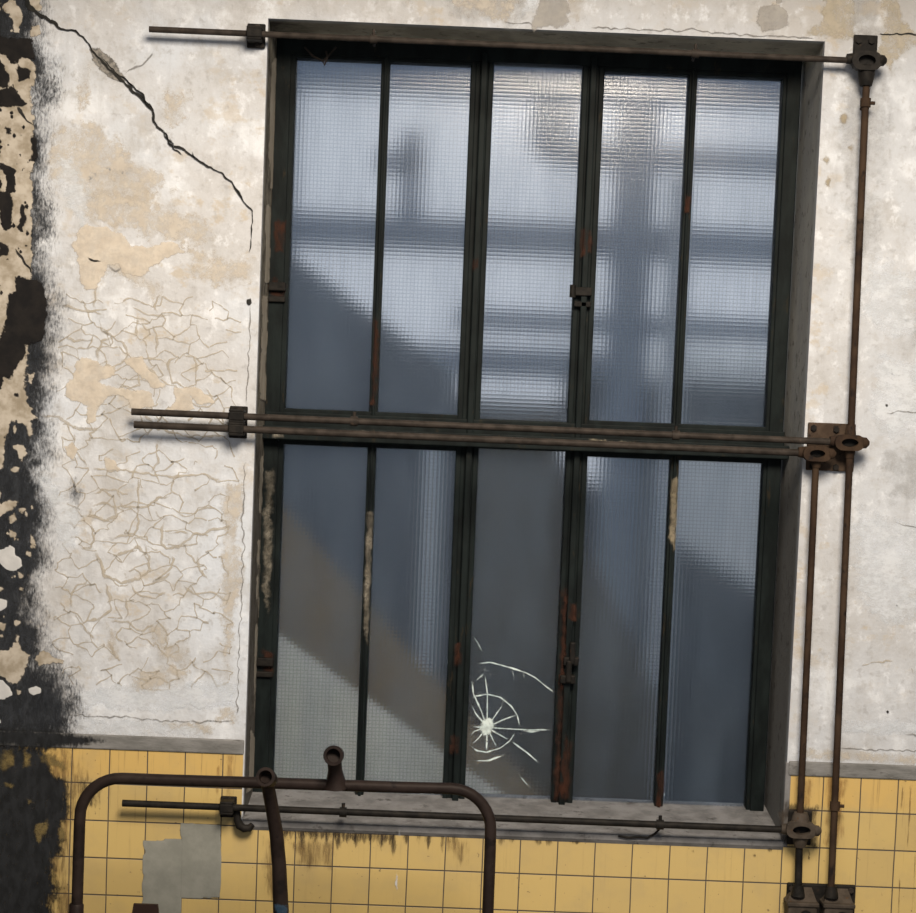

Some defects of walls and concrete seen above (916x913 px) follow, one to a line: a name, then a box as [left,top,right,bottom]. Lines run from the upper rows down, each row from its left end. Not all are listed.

crack [25,0,253,249]
peeling [0,0,48,472]
peeling [72,190,249,290]
peeling [66,356,215,424]
damp [871,361,916,433]
peeling [0,492,36,591]
crack [47,289,251,724]
damp [855,512,916,622]
peeling [0,587,64,700]
peeling [142,823,221,913]
damp [284,830,395,866]